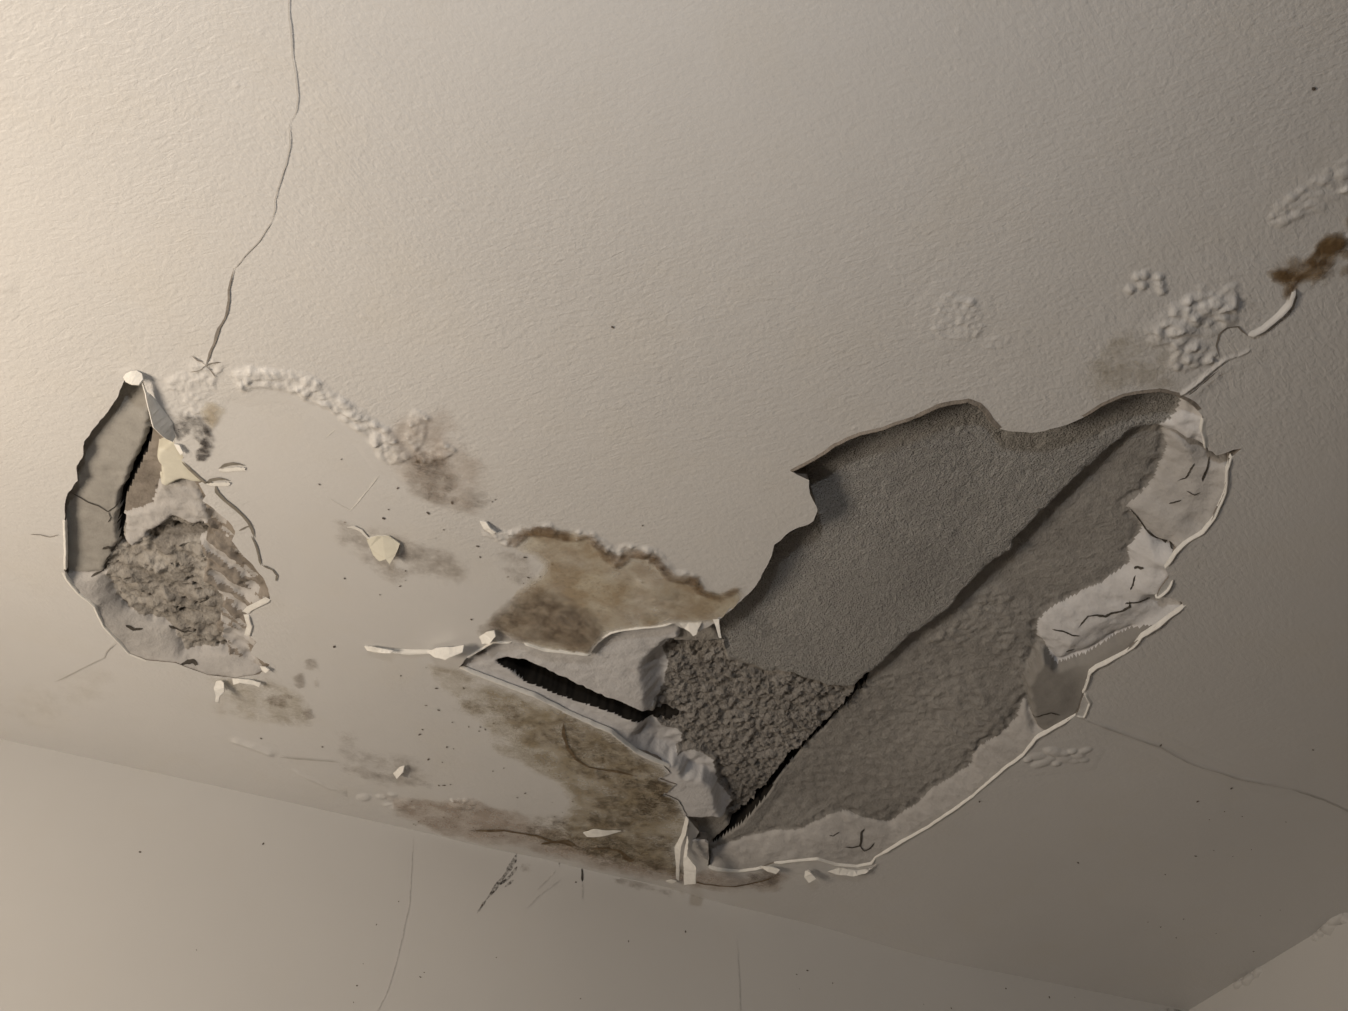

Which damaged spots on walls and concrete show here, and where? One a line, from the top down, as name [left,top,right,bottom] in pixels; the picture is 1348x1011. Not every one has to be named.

crack [192,0,298,376]
corrosion [1271,235,1348,297]
flaking render [62,342,469,703]
leakage [399,691,778,900]
leakage [491,527,738,652]
flaking render [364,388,1241,885]